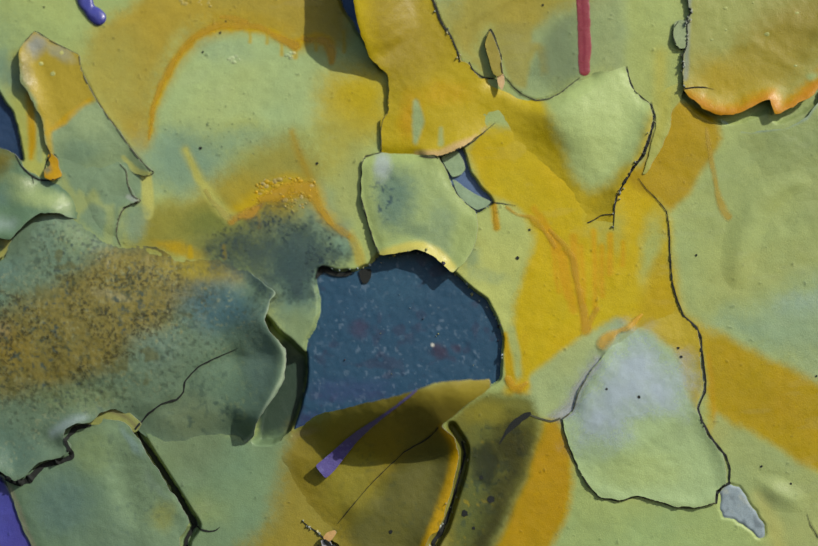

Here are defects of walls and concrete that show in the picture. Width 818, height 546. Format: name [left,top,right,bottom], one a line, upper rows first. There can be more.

crack [421,123,495,158]
crack [432,0,580,101]
crack [672,0,711,89]
peeling [0,32,286,546]
peeling [279,0,818,546]
crack [499,67,731,509]
crack [134,348,238,546]